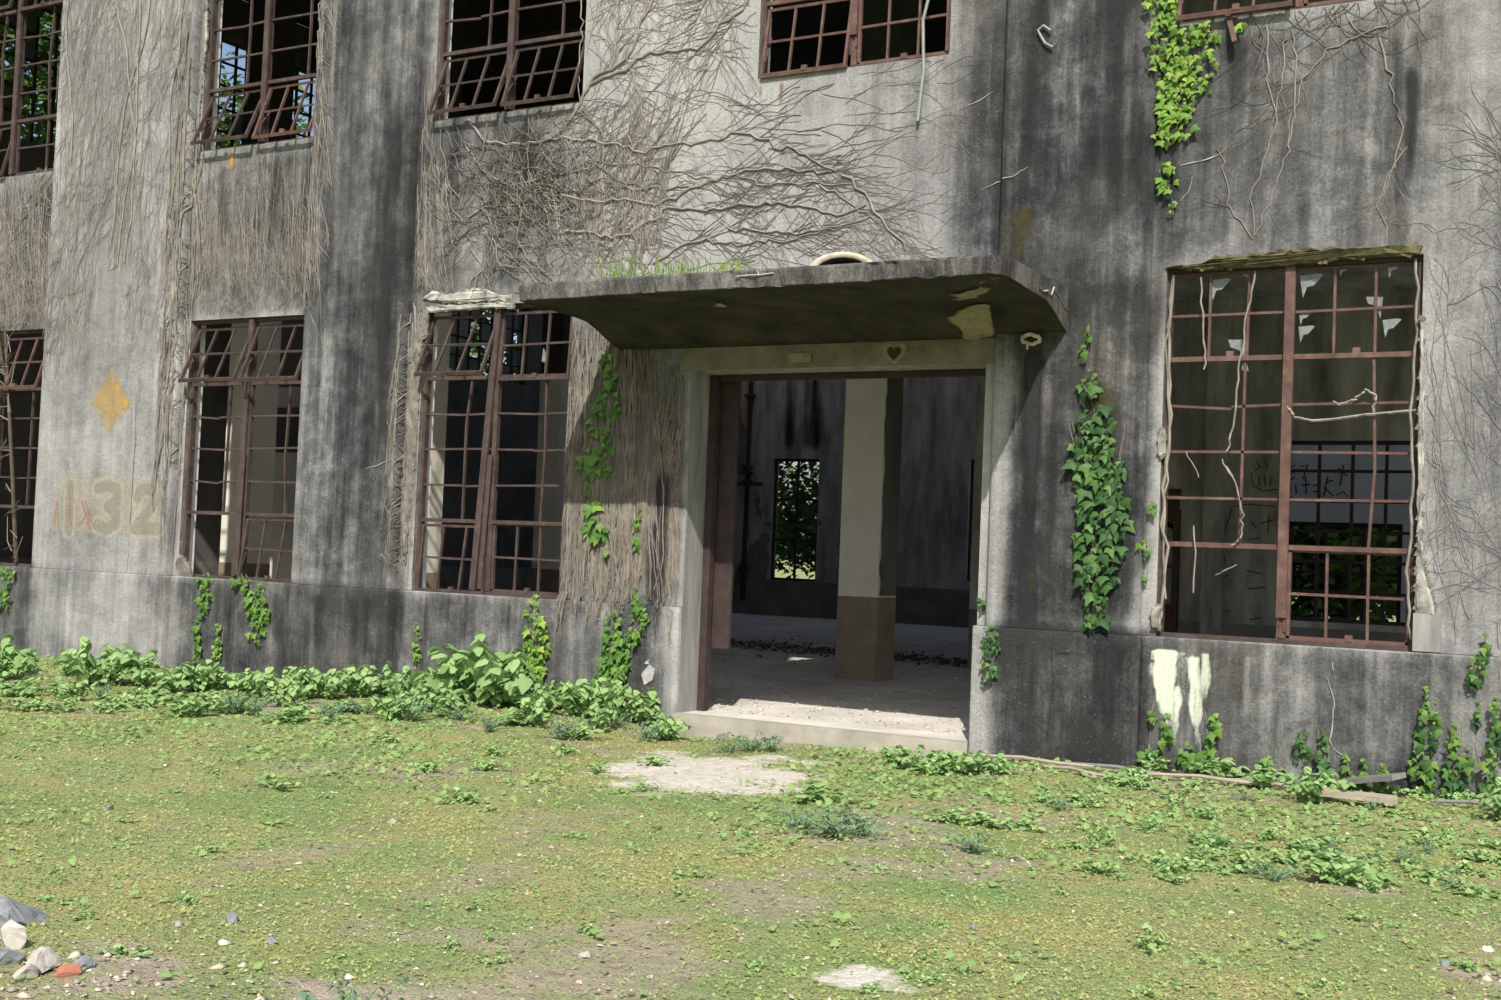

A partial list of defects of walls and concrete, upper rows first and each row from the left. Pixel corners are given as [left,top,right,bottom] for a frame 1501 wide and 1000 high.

damp [1095,0,1144,174]
damp [371,88,401,388]
peeling [948,277,997,340]
damp [1023,350,1042,511]